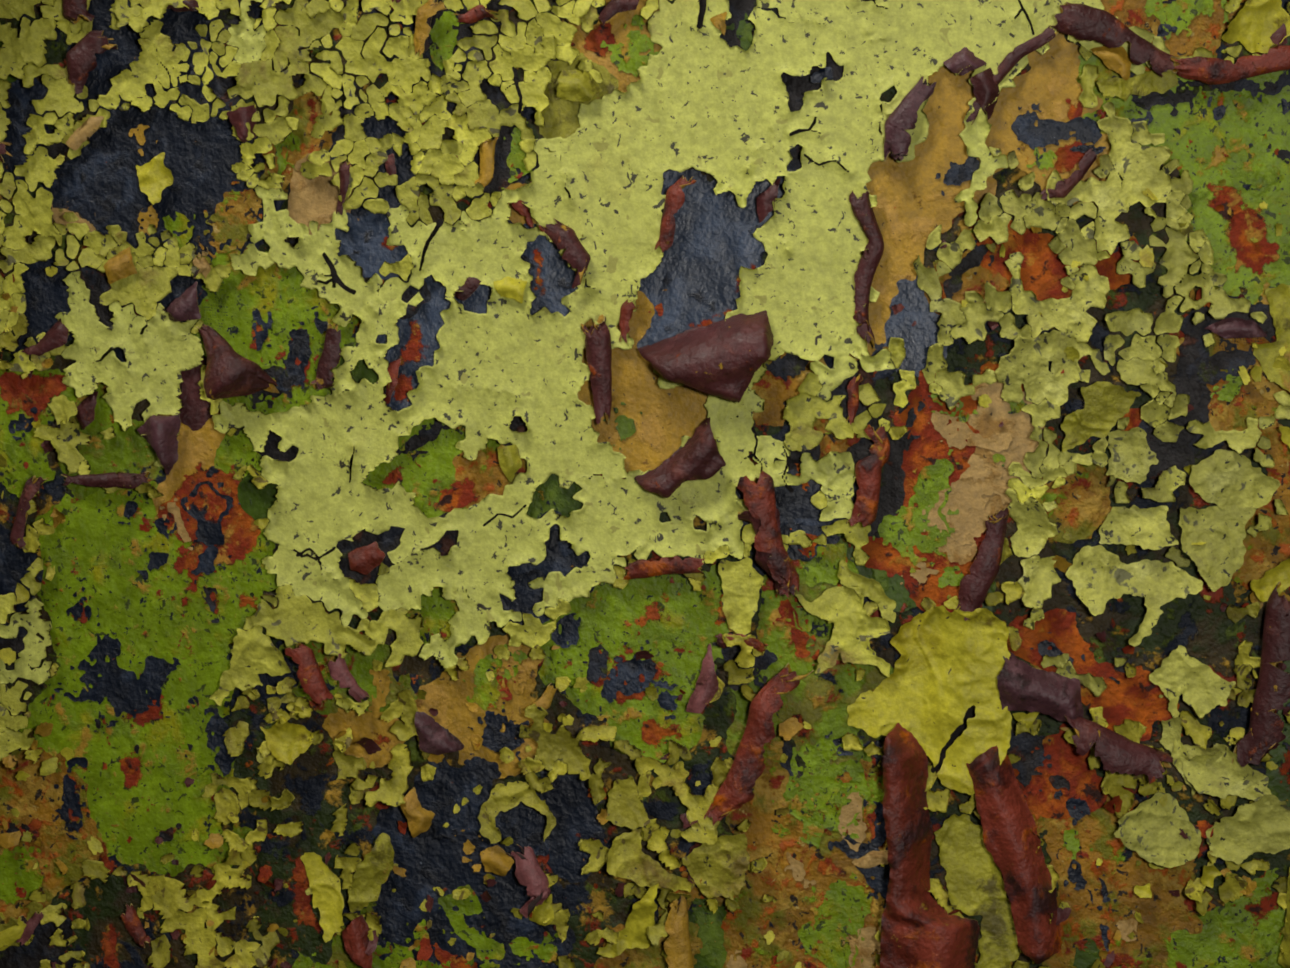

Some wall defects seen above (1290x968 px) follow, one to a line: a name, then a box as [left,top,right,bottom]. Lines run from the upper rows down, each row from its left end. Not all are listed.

crack [697,0,707,29]
crack [419,219,446,271]
crack [316,252,356,295]
peeling [1272,346,1290,371]
peeling [494,645,510,661]
peeling [574,677,589,693]
peeling [779,717,812,741]
crack [931,705,976,773]
peeling [495,801,550,856]
peeling [87,837,104,855]
peeling [1200,865,1222,888]
peeling [400,957,416,968]